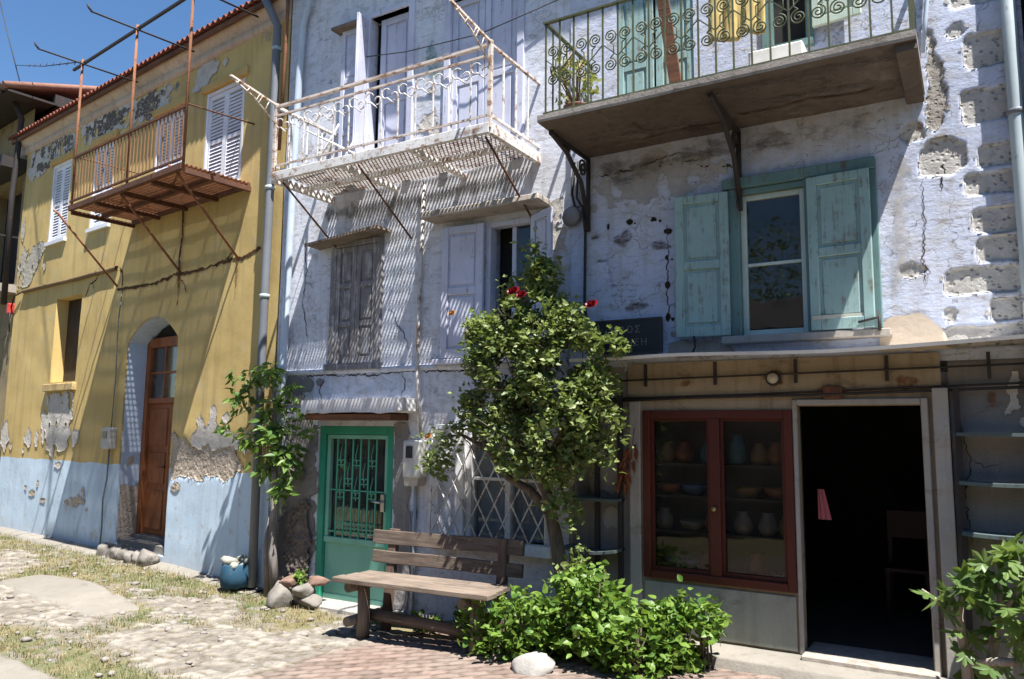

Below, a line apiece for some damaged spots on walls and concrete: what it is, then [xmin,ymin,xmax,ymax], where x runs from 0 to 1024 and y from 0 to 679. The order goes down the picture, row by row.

peeling [192,58,228,93]
peeling [27,84,173,182]
peeling [17,219,46,290]
crack [906,164,946,285]
flaking render [893,22,1024,348]
peeling [0,391,79,469]
spalling [169,404,253,492]
peeling [1005,371,1024,427]